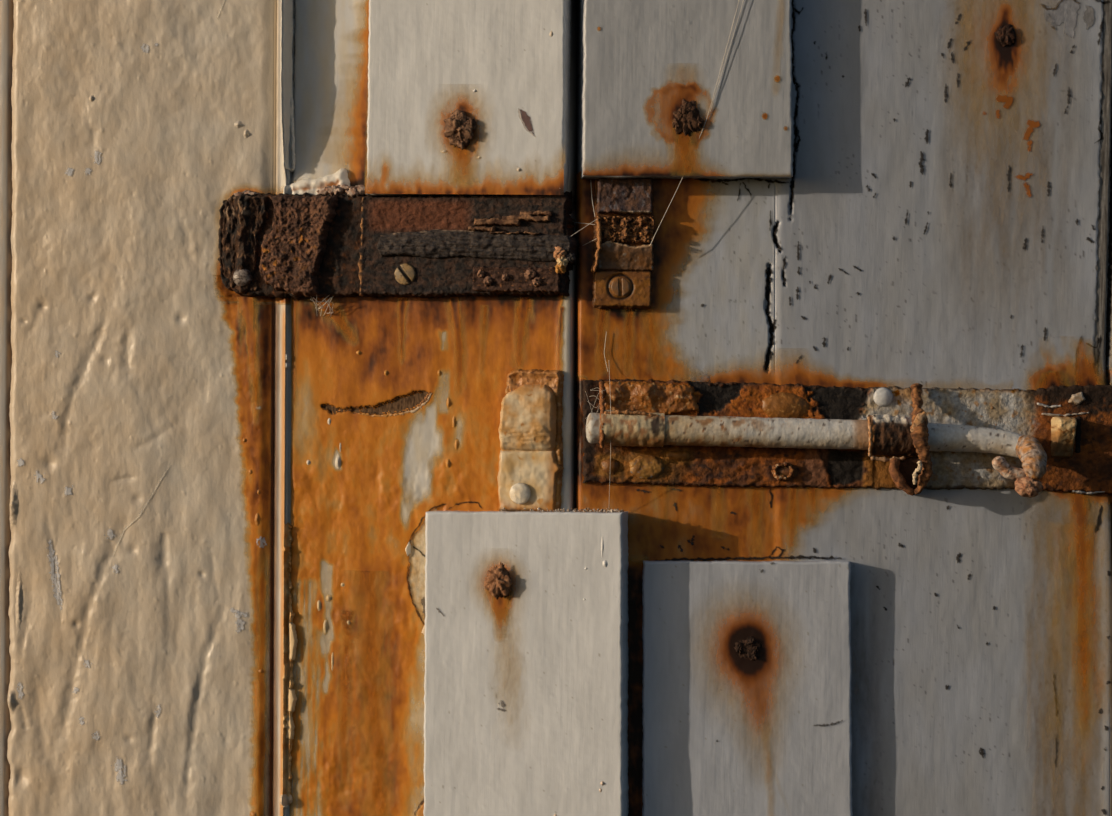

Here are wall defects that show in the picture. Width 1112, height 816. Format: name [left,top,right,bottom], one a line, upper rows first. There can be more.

corrosion [983,3,1024,118]
corrosion [1023,120,1040,151]
peeling [1041,0,1112,373]
corrosion [216,0,890,816]
corrosion [1029,345,1112,391]
corrosion [1047,490,1112,720]